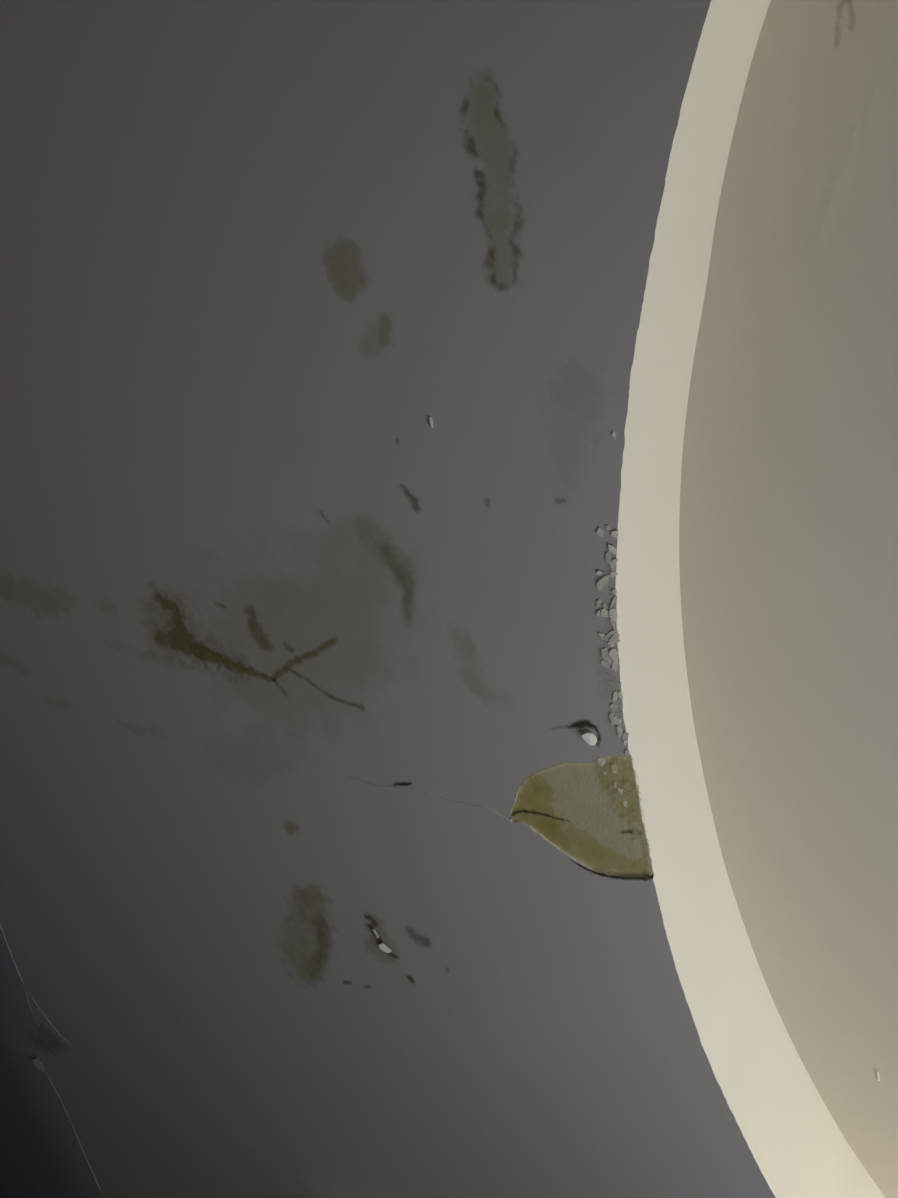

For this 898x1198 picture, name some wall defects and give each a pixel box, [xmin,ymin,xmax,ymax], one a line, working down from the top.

flaking render [508,526,654,881]
crack [393,783,509,821]
spalling [365,916,398,958]